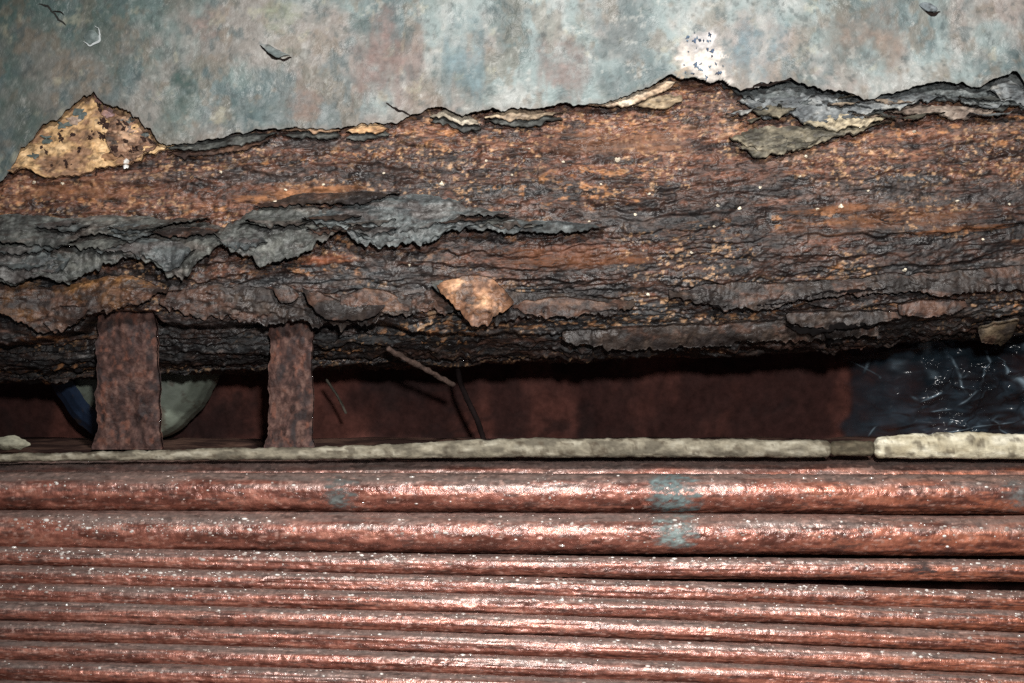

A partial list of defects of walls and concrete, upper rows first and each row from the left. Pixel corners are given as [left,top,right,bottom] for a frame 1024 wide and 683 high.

peeling [578,30,1024,158]
peeling [7,92,390,179]
rust [238,185,353,201]
peeling [0,214,212,284]
peeling [213,190,606,267]
rust [271,284,385,321]
rust [431,275,514,327]
rust [978,318,1019,346]